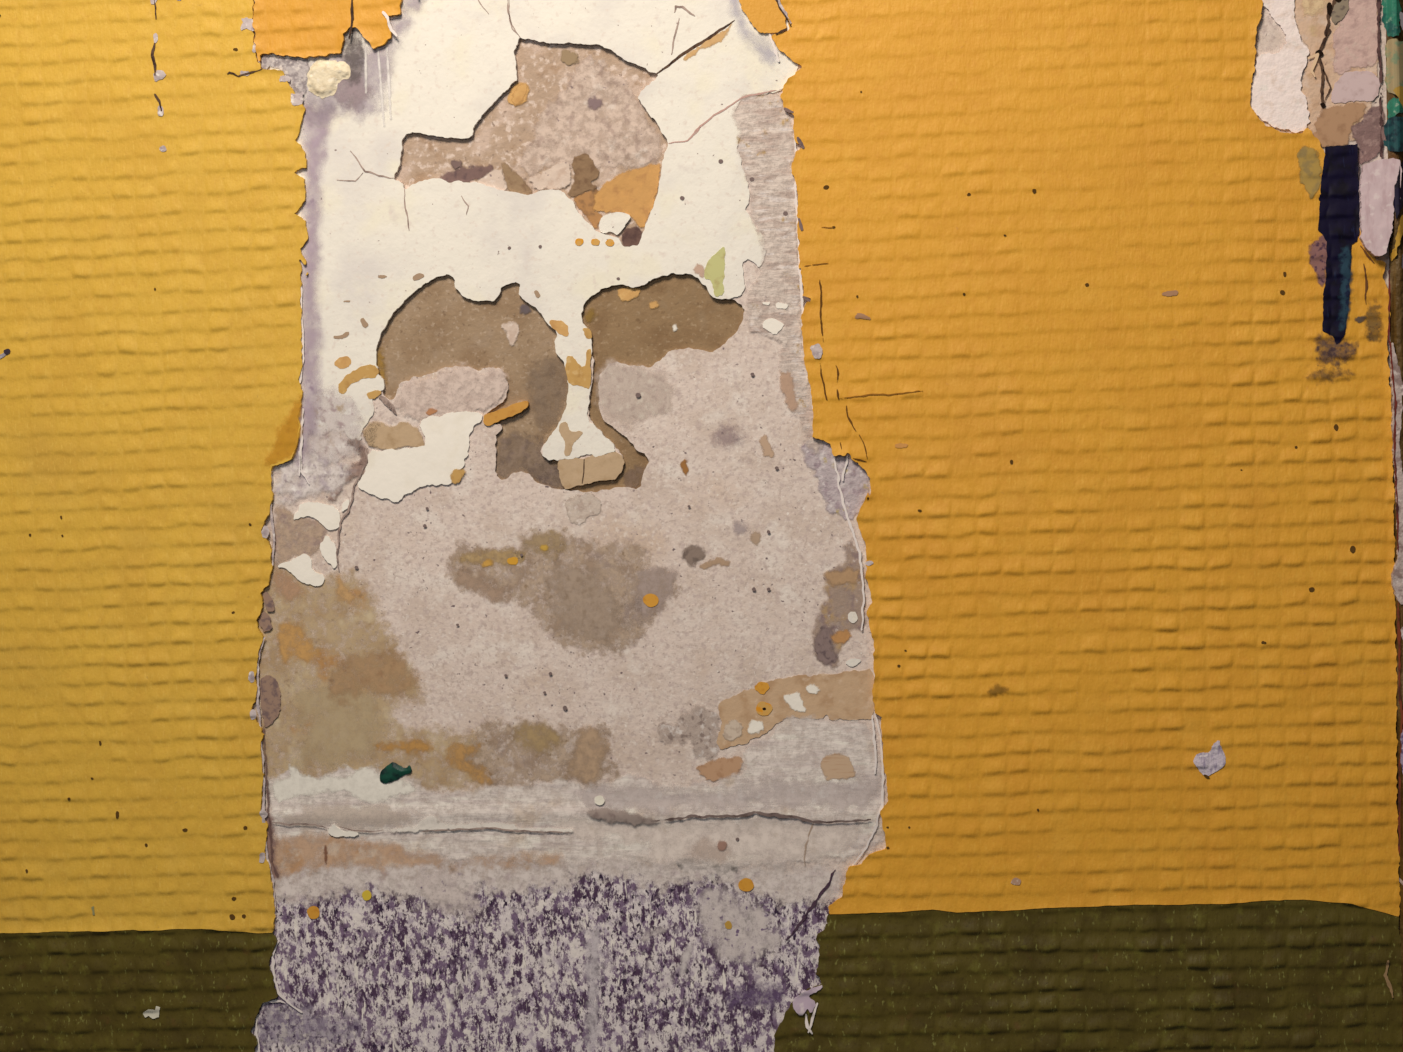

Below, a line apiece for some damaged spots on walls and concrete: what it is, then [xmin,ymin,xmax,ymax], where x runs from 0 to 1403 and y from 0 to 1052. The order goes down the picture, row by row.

crack [656,5,735,74]
flaking render [1250,0,1403,268]
crack [1315,0,1383,157]
peeling [268,0,798,568]
crack [806,263,919,462]
leakage [256,563,619,790]
leakage [448,528,677,656]
peeling [268,684,889,868]
crack [422,808,871,865]